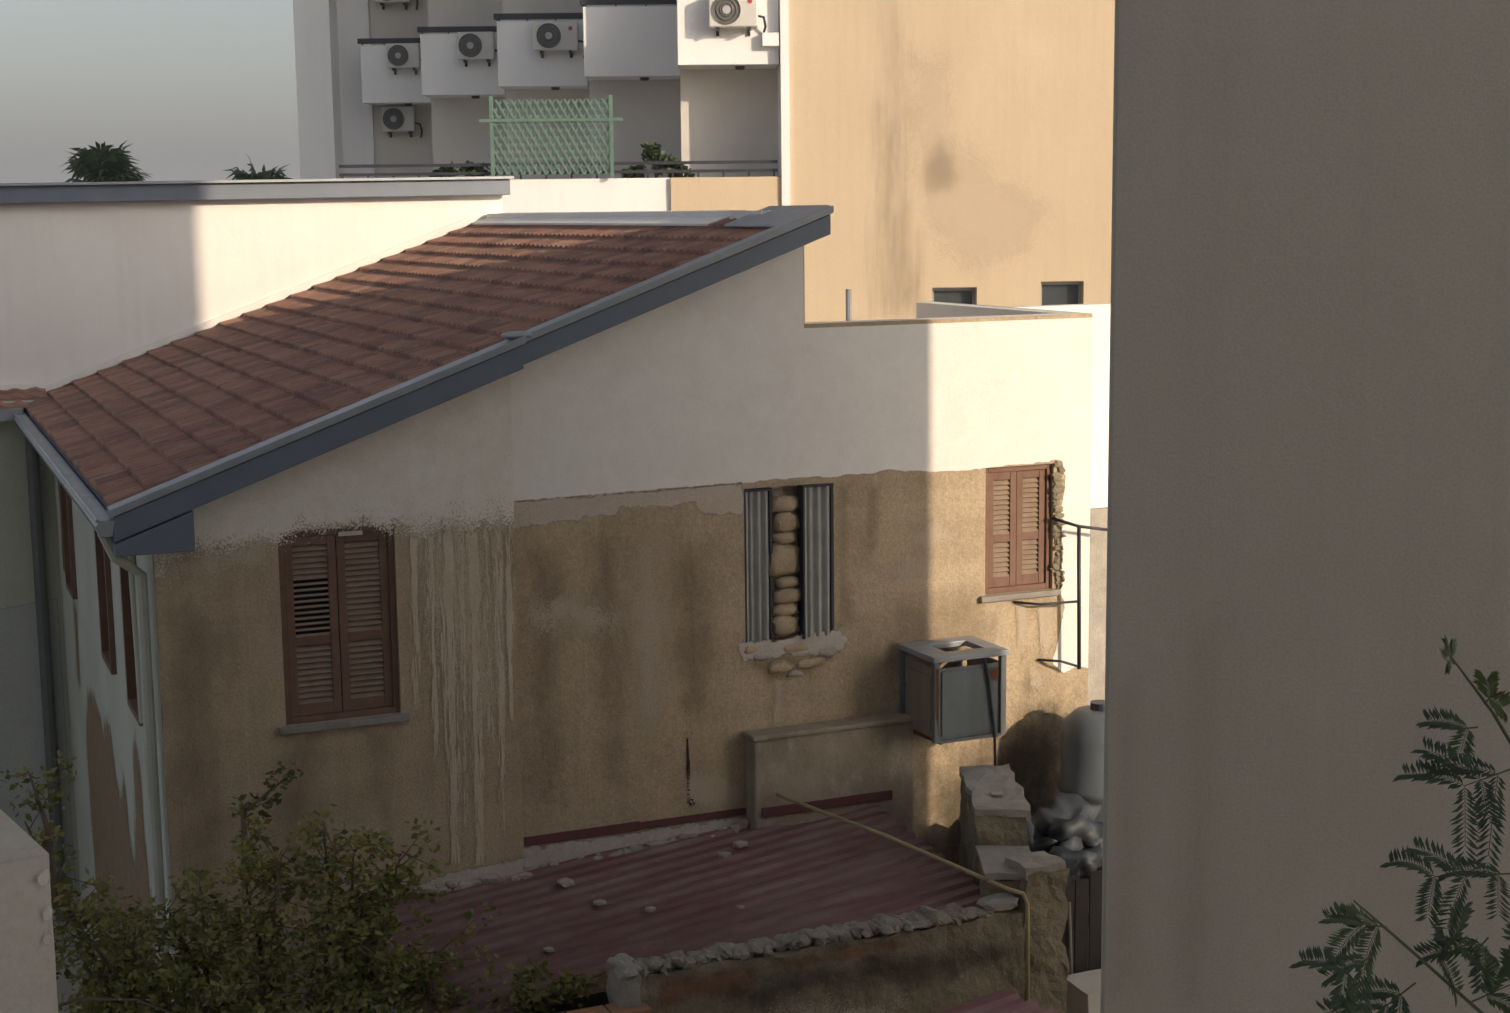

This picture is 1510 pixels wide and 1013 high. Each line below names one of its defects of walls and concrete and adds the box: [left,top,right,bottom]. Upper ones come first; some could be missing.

peeling [72,600,174,1013]
leakage [373,491,686,868]
spalling [738,494,848,677]